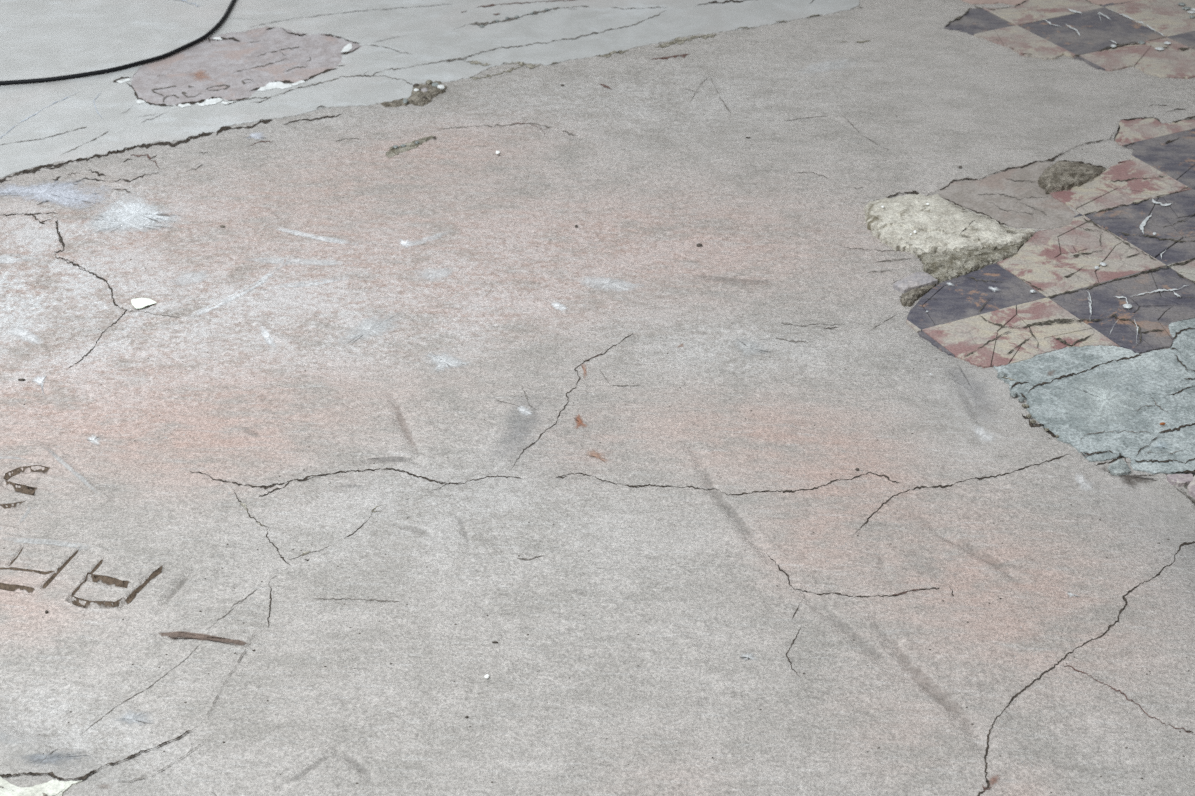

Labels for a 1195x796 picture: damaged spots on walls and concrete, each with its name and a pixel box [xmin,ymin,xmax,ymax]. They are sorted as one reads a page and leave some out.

spalling [113,27,362,108]
spalling [458,6,588,28]
spalling [944,0,1195,79]
hole [386,135,436,158]
crack [0,93,175,368]
crack [848,247,911,272]
spalling [906,118,1195,369]
crack [558,327,1195,534]
spalling [1166,473,1195,498]
crack [0,332,638,782]
crack [769,556,954,676]
crack [978,541,1195,796]